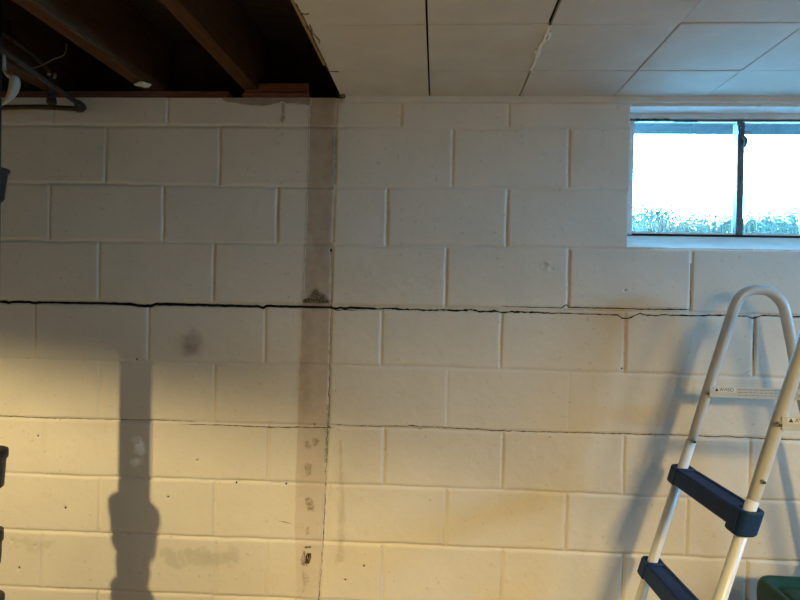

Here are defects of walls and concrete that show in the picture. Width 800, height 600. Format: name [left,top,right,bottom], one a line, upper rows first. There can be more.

damp [174,321,208,360]
crack [0,263,800,402]
crack [161,420,793,600]